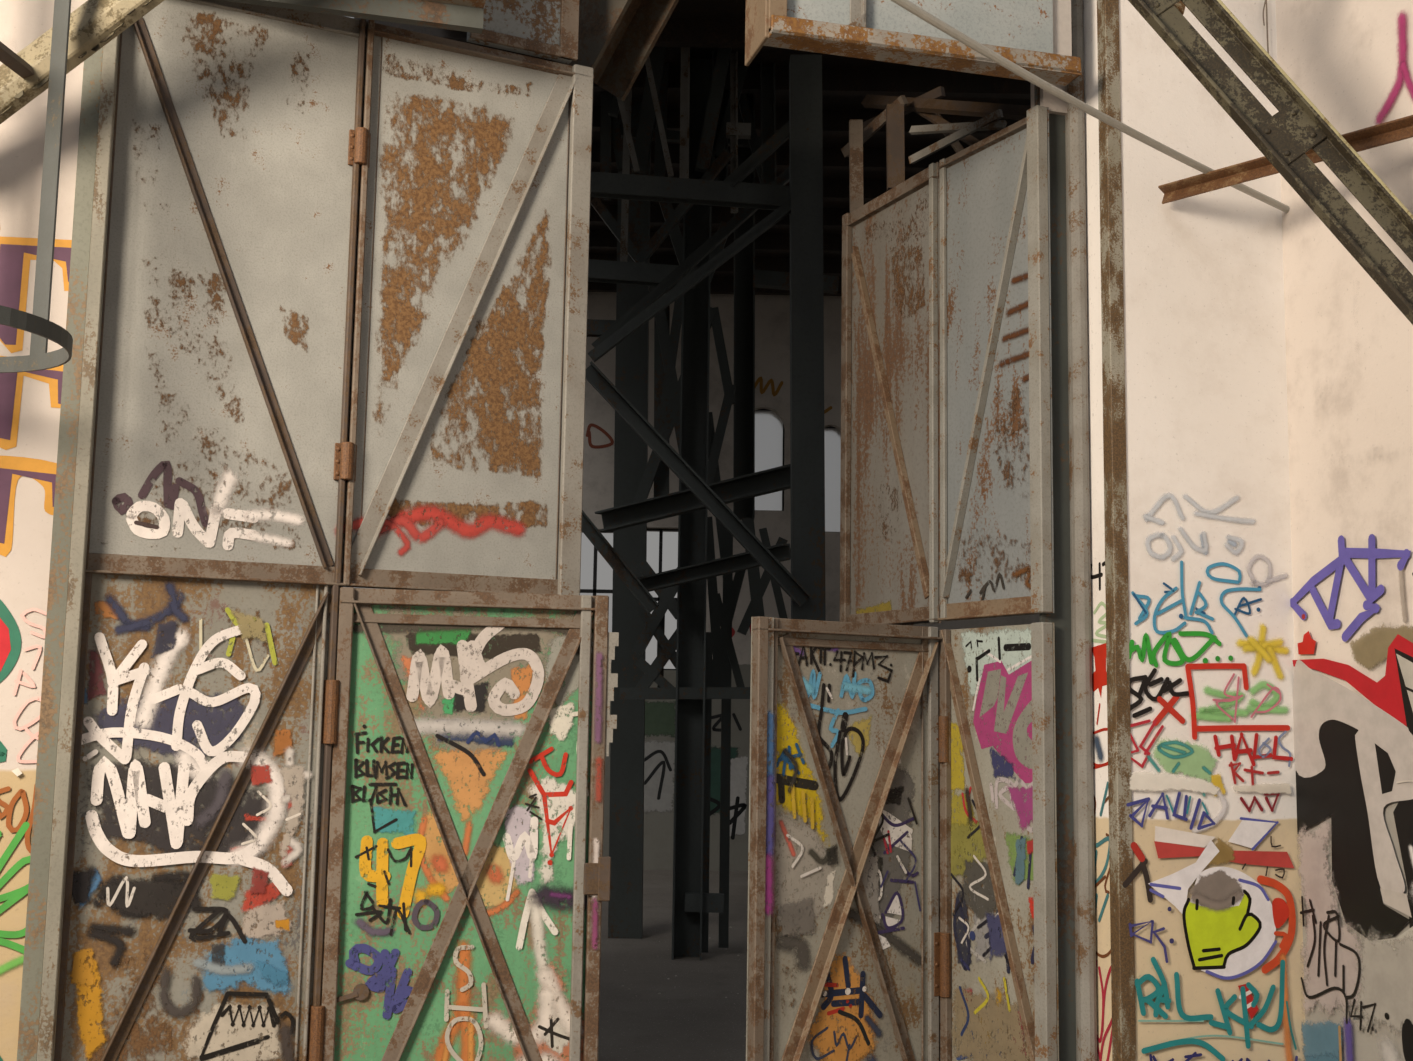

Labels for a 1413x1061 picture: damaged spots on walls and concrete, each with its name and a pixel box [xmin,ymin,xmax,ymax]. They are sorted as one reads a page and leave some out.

rust [182,12,268,137]
rust [148,353,187,442]
rust [143,257,244,422]
rust [280,306,309,349]
rust [377,54,532,387]
rust [431,212,551,479]
rust [866,199,927,318]
rust [994,327,1030,488]
rust [1006,301,1028,316]
rust [137,429,292,535]
rust [958,529,1031,589]